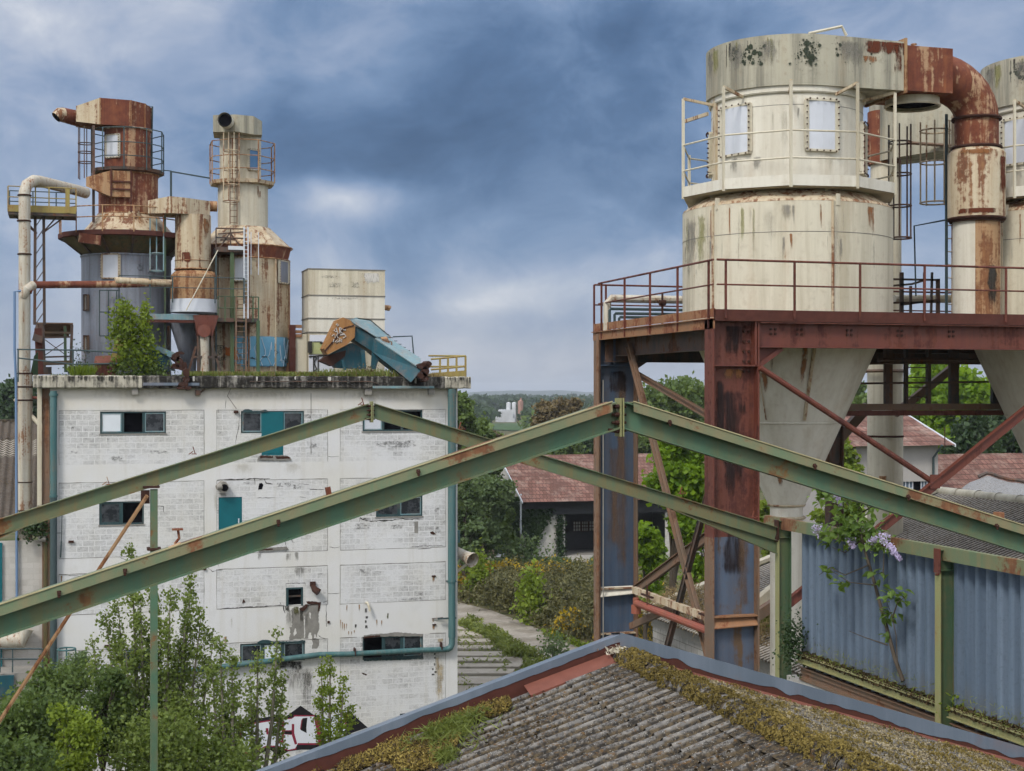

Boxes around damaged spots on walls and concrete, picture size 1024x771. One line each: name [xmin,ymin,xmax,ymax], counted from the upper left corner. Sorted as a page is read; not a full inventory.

rust [961,149,1006,189]
rust [958,208,1001,314]
rust [717,382,745,434]
rust [724,461,743,489]
rust [724,534,745,572]
spalling [289,601,321,649]